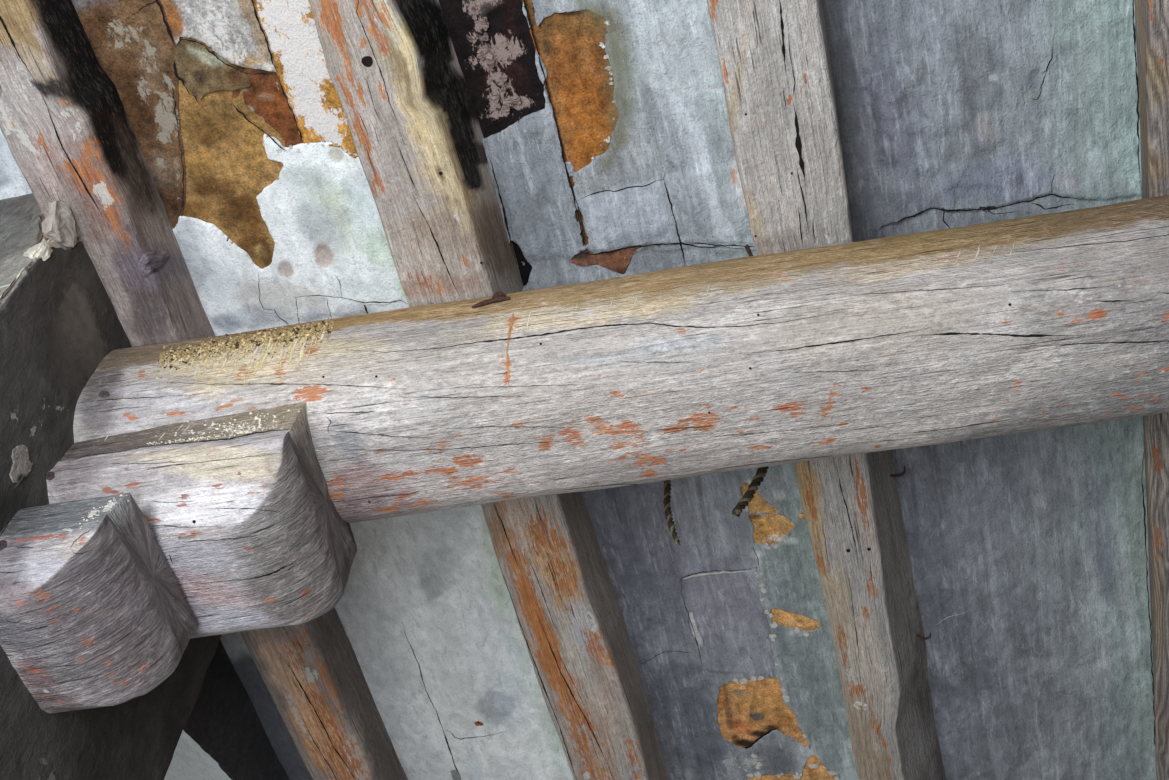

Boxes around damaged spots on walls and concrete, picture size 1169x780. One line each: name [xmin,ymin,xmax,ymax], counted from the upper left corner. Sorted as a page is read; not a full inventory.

peeling [71,0,358,269]
peeling [530,9,619,172]
spalling [0,201,80,300]
crack [568,175,755,265]
crack [873,176,1097,232]
peeling [741,482,806,550]
peeling [769,609,820,637]
peeling [717,676,839,780]